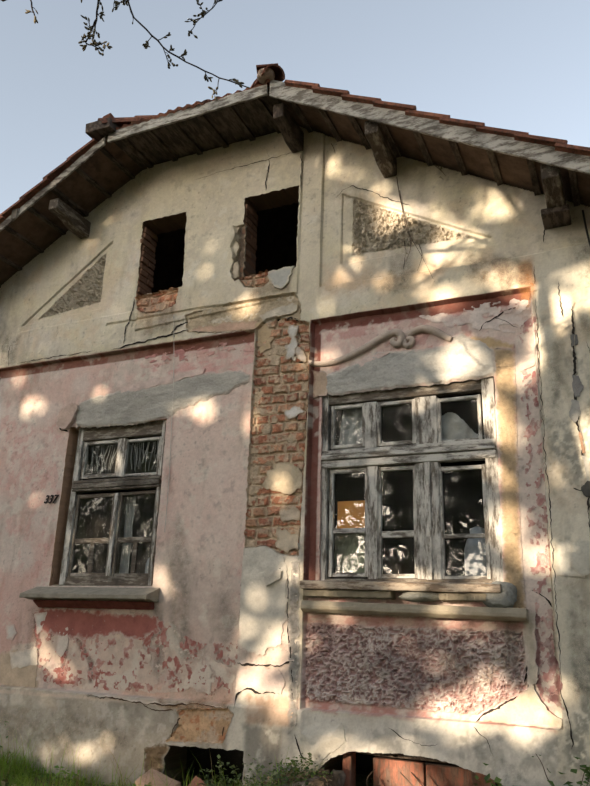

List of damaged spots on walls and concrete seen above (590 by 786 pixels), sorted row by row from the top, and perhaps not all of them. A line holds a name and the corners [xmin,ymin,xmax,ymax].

crack [8,300,188,366]
flaking render [0,224,328,735]
flaking render [419,298,564,731]
crack [478,307,516,331]
crack [532,270,574,747]
crack [558,281,590,537]
flaking render [143,708,234,773]